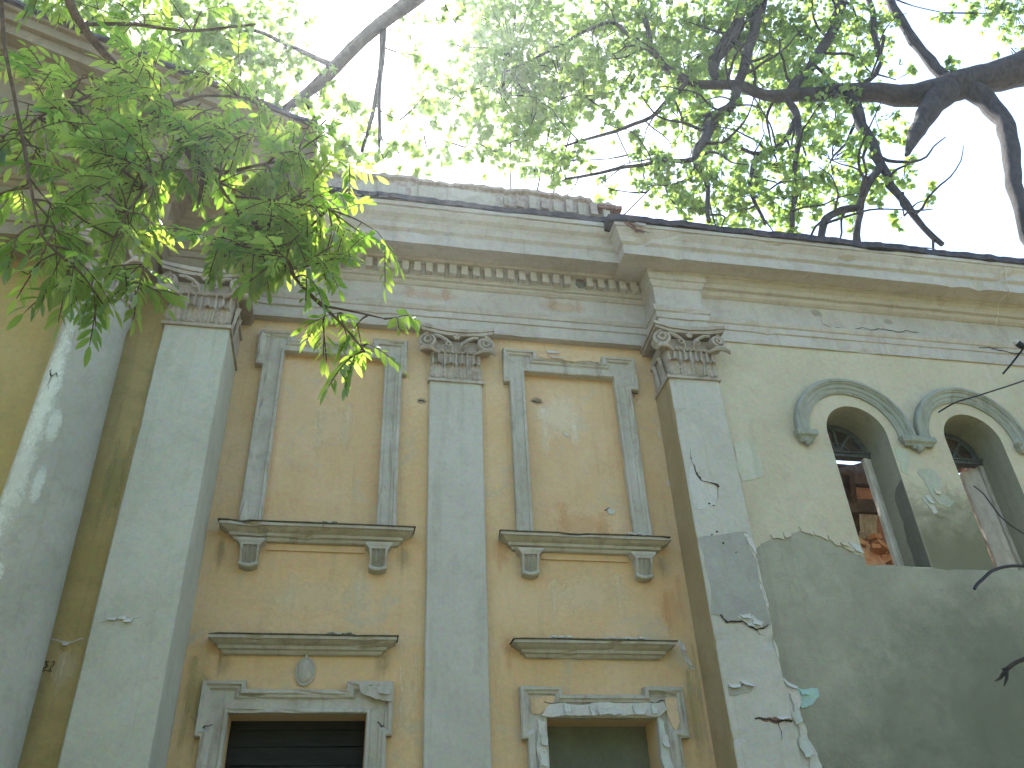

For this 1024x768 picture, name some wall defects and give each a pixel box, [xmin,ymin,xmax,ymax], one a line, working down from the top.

peeling [736,526,1024,768]